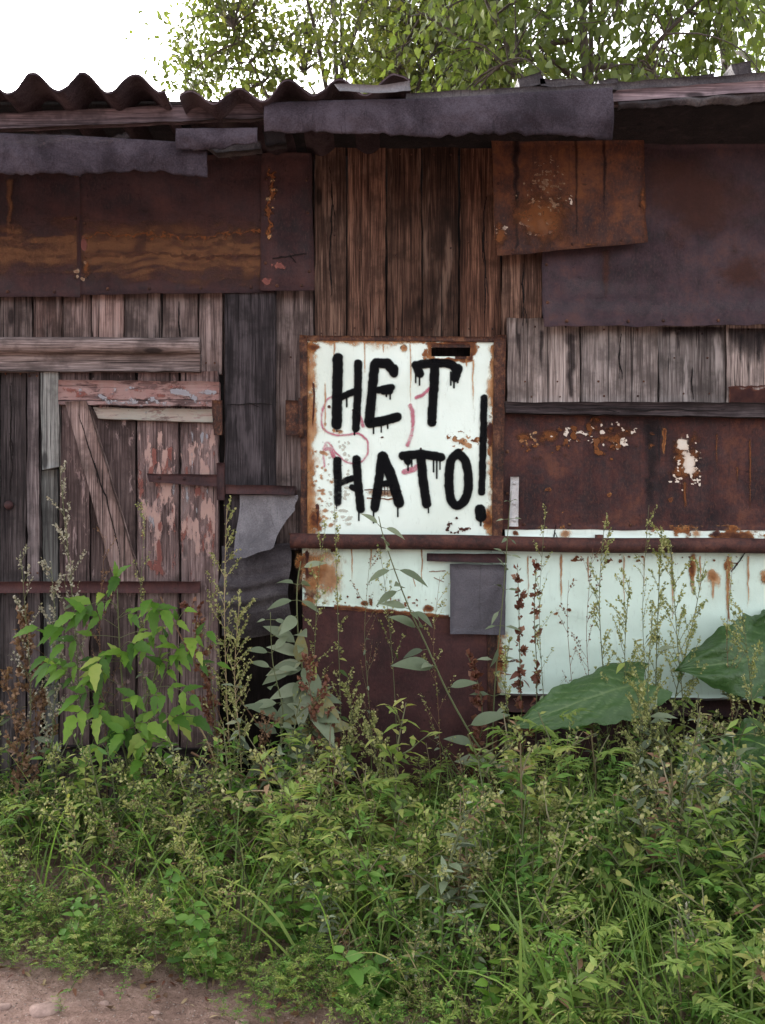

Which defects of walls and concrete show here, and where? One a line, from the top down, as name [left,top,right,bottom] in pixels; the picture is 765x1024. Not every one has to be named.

corrosion [0,152,315,297]
corrosion [491,140,765,327]
peeling [63,385,217,407]
peeling [138,428,216,576]
corrosion [307,341,765,538]
peeling [662,428,701,506]
corrosion [295,551,449,618]
corrosion [545,553,645,600]
corrosion [666,554,765,619]